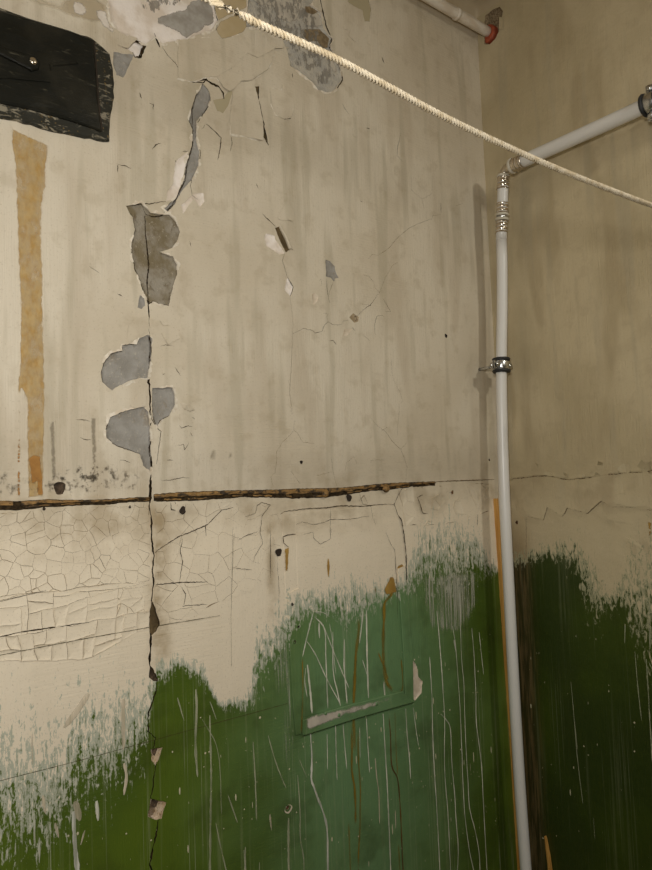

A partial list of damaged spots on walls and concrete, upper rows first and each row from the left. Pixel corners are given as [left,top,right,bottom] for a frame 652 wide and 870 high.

flaking render [106,0,343,309]
spalling [101,335,178,475]
crack [0,80,491,799]
peeling [509,459,652,523]
spalling [151,747,162,765]
spalling [148,799,166,820]
crack [149,820,159,870]